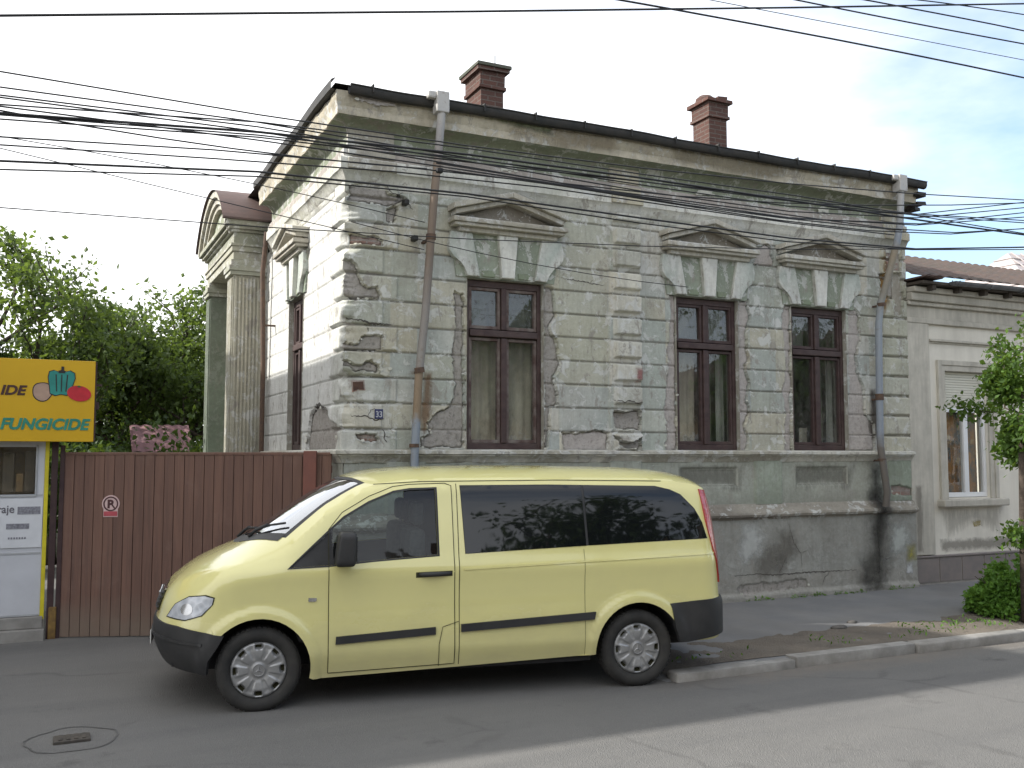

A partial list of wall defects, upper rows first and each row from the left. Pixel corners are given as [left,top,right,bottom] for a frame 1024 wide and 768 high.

flaking render [342,260,379,301]
flaking render [342,335,392,392]
flaking render [420,294,463,449]
flaking render [304,406,341,450]
flaking render [613,410,639,449]
water stain [739,525,764,563]
water stain [863,470,909,583]